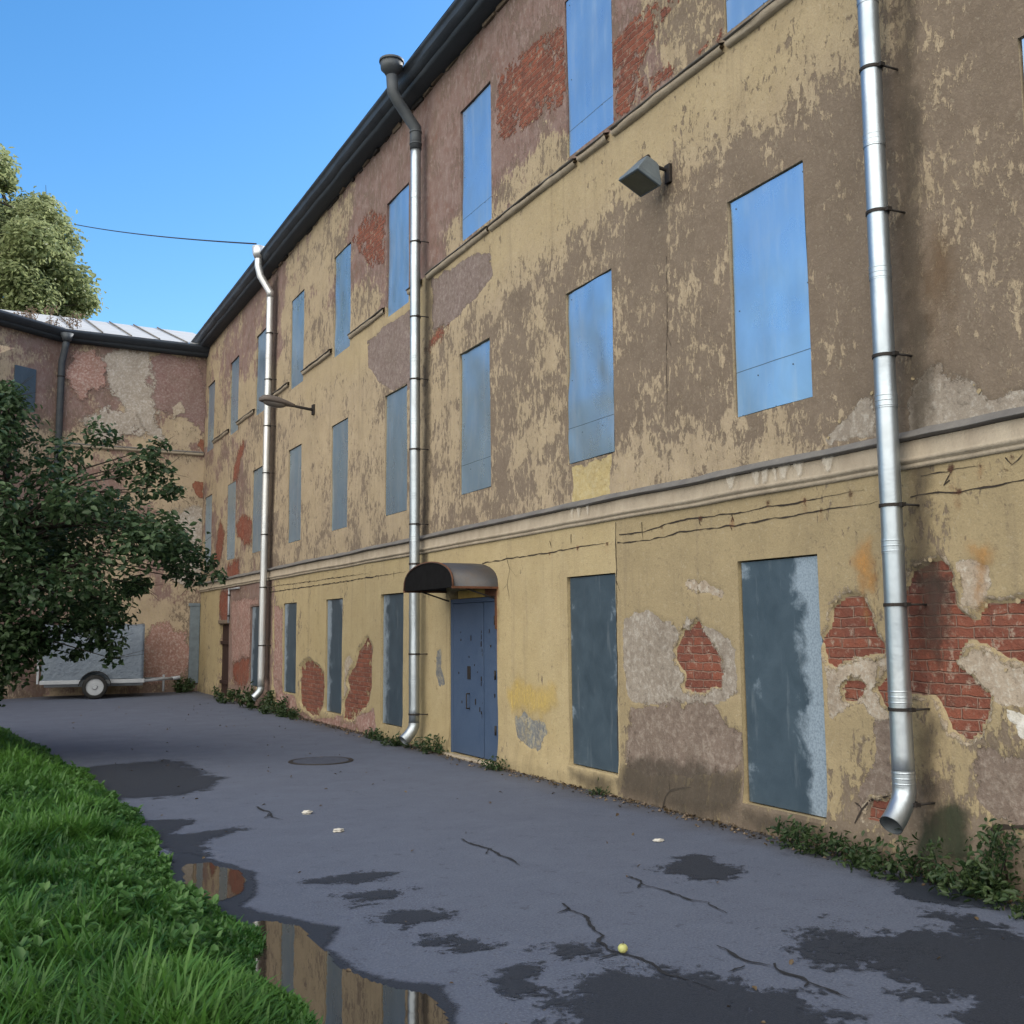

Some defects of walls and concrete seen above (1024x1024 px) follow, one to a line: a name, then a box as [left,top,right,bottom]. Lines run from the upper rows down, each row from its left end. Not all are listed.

spalling [494,25,566,140]
spalling [612,0,679,121]
flaking render [65,348,206,443]
flaking render [823,391,876,446]
flaking render [907,362,1024,433]
flaking render [144,621,189,687]
spalling [273,605,376,733]
crack [482,490,877,748]
flaking render [623,610,743,776]
spalling [820,586,892,832]
spalling [906,554,1024,826]
damp [622,761,738,813]